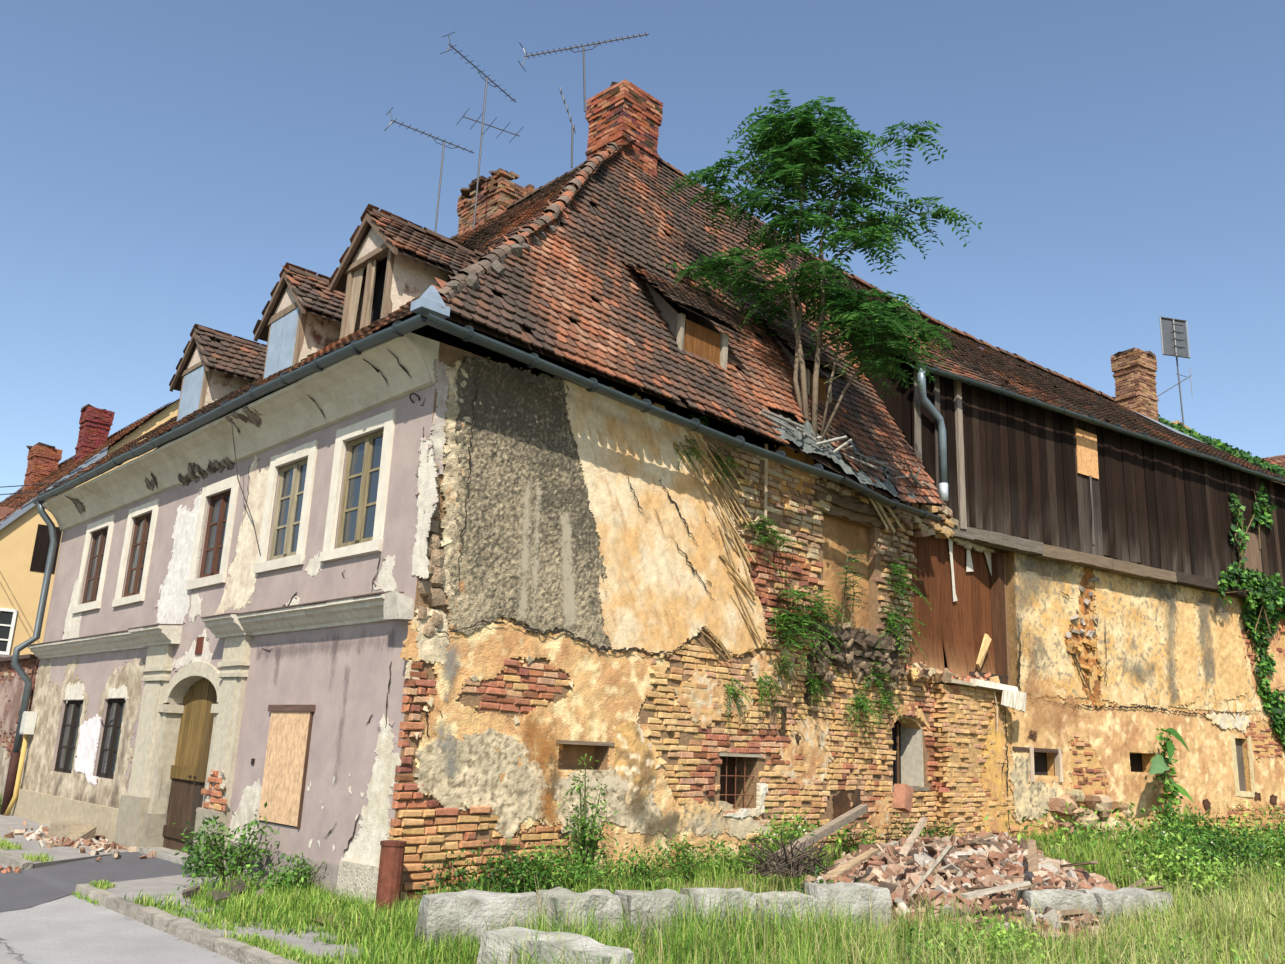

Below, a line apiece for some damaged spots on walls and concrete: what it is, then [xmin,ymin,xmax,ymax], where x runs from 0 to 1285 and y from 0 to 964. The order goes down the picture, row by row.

peeling [62,579,82,640]
peeling [20,655,146,809]
peeling [154,454,269,670]
spalling [308,655,573,902]
crack [432,371,734,661]
spalling [637,447,939,858]
spalling [1064,568,1104,709]
crack [1002,613,1266,833]